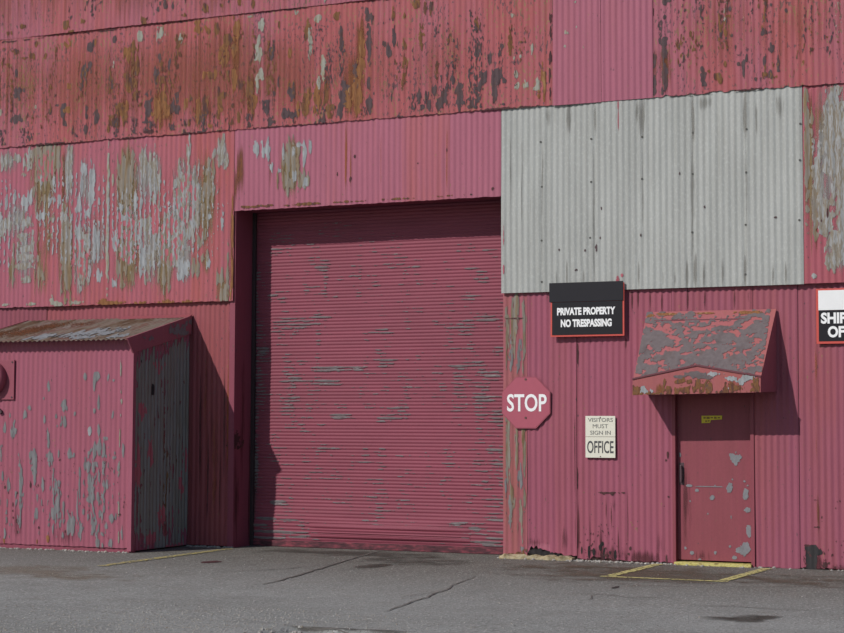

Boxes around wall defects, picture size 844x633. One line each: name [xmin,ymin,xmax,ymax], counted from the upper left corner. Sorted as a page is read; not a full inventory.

peeling [0,0,546,306]
peeling [803,83,844,274]
corrosion [0,322,88,337]
peeling [633,309,771,395]
peeling [1,319,192,549]
peeling [686,479,733,502]
peeling [729,525,751,560]